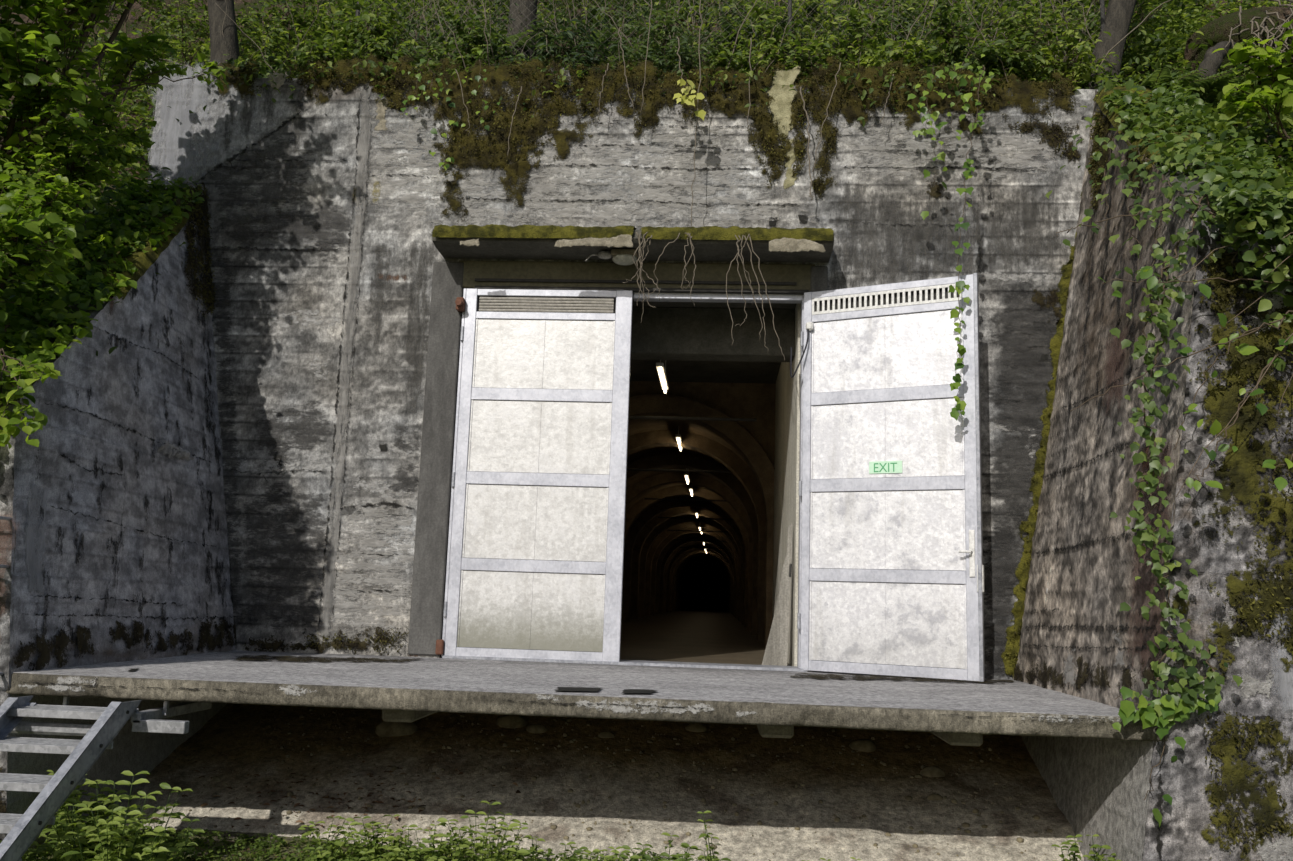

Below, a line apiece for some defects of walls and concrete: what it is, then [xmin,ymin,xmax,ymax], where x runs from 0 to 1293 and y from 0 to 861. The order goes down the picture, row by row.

damp [360,107,818,407]
damp [94,86,420,648]
damp [828,111,1065,679]
damp [1054,165,1160,562]
damp [55,521,85,564]
damp [1190,506,1228,550]
damp [35,562,78,657]
damp [1063,649,1077,685]
damp [1199,579,1226,624]
damp [1270,606,1293,713]